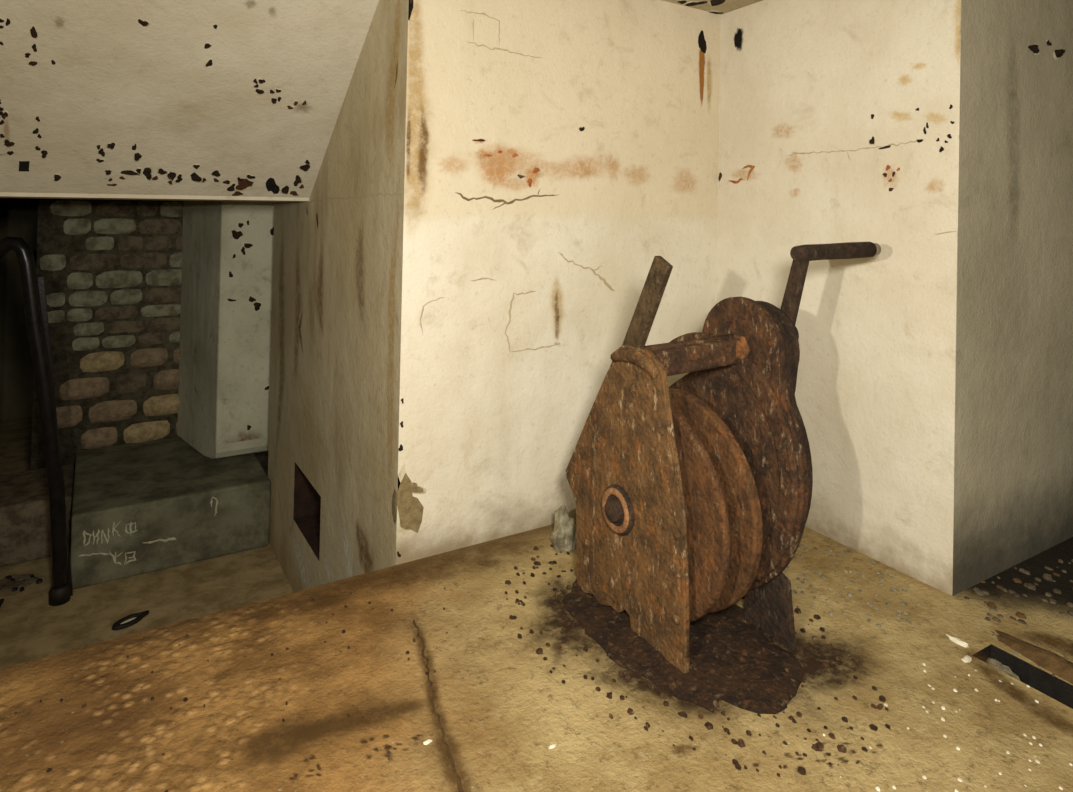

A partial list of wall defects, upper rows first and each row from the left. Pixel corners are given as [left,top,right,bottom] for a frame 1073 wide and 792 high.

rust [698,30,710,101]
peeling [0,100,49,172]
peeling [96,143,310,196]
damp [407,50,428,183]
rust [472,139,518,181]
crack [455,188,556,209]
rust [527,167,540,188]
peeling [916,105,954,152]
crack [558,252,615,291]
crack [471,278,559,352]
spalling [392,444,426,537]
crack [413,619,469,792]